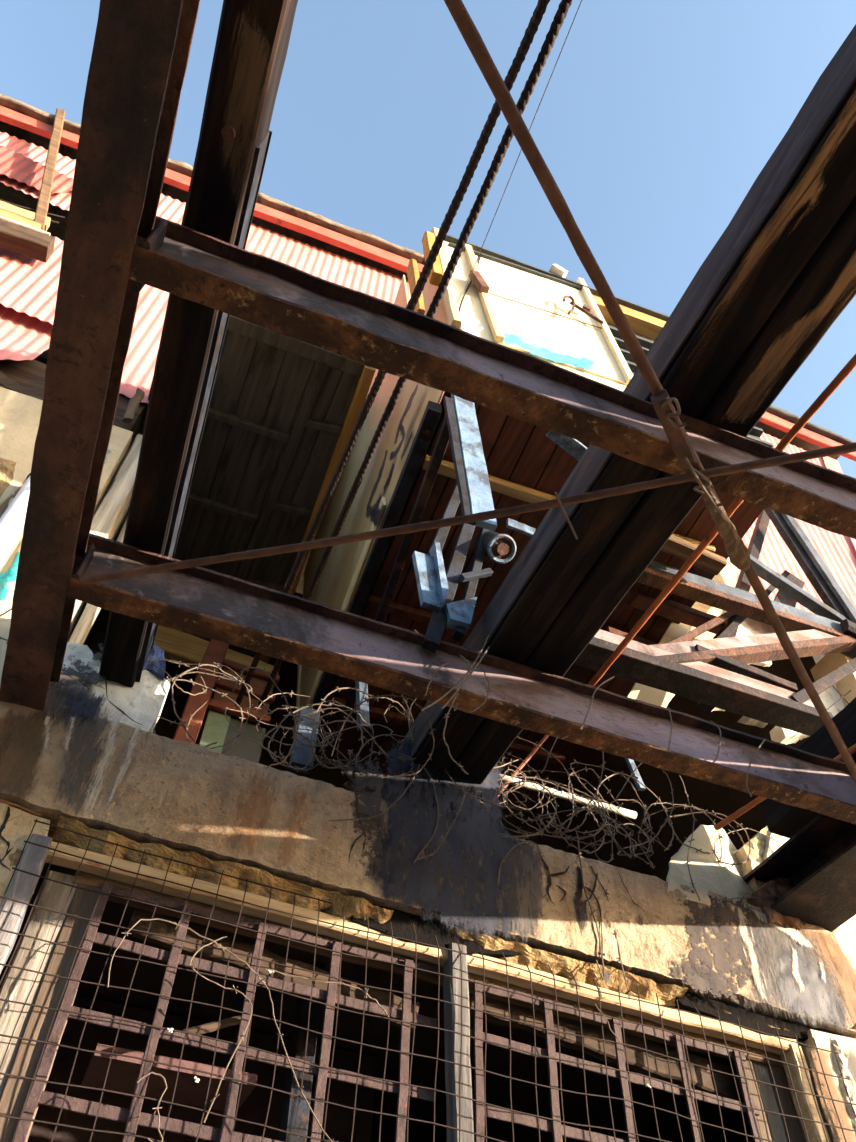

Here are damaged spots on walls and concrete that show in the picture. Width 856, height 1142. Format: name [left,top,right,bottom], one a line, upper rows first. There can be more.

corrosion [0,711,52,799]
crack [0,798,42,886]
peeling [830,1023,856,1130]